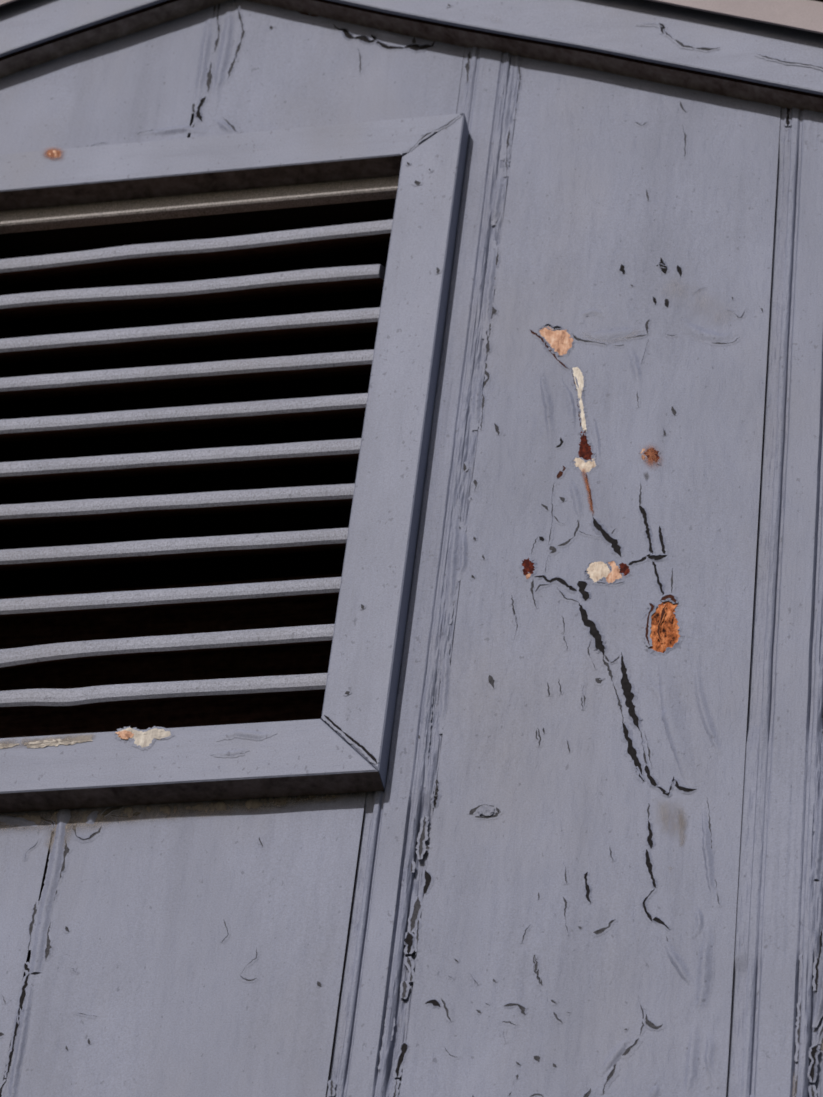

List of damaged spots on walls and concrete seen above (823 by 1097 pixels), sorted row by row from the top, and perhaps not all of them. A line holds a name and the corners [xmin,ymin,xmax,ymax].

crack [331,23,442,75]
corrosion [43,148,64,160]
peeling [528,323,598,460]
corrosion [571,429,599,510]
corrosion [639,446,662,466]
corrosion [518,556,538,581]
peeling [583,555,648,587]
peeling [638,593,685,656]
crack [508,432,697,931]
peeling [114,726,175,750]
crack [0,838,80,1097]
crack [378,779,617,1097]